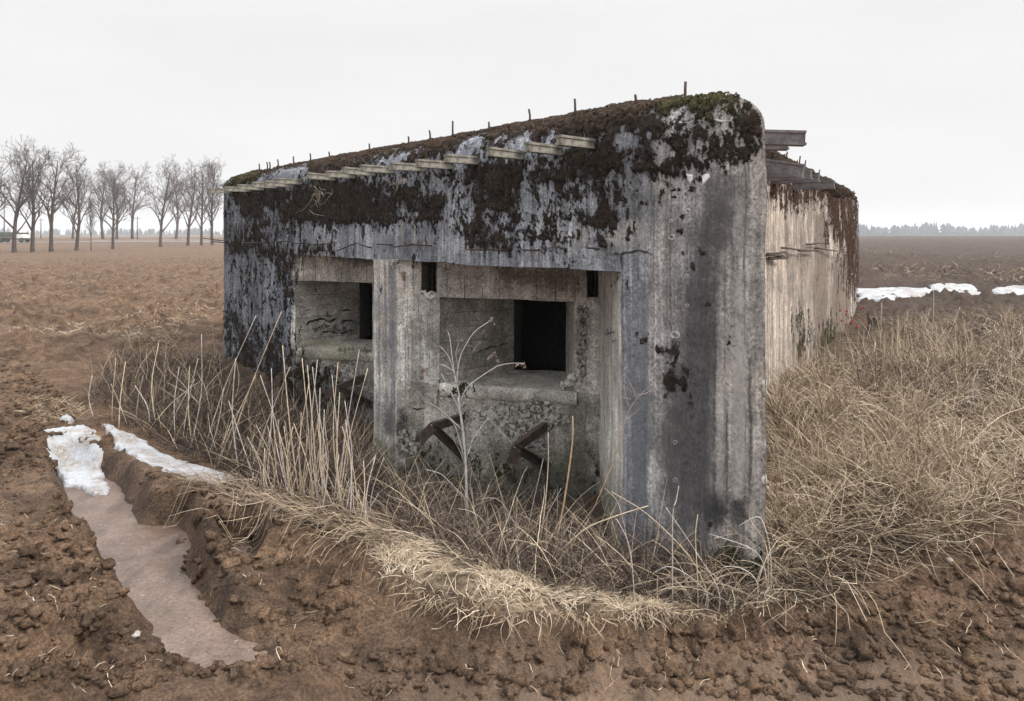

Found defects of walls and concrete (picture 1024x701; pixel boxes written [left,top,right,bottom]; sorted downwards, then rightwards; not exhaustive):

leakage [607,221,647,246]
leakage [785,216,849,353]
spalling [461,400,570,452]
leakage [626,179,752,544]